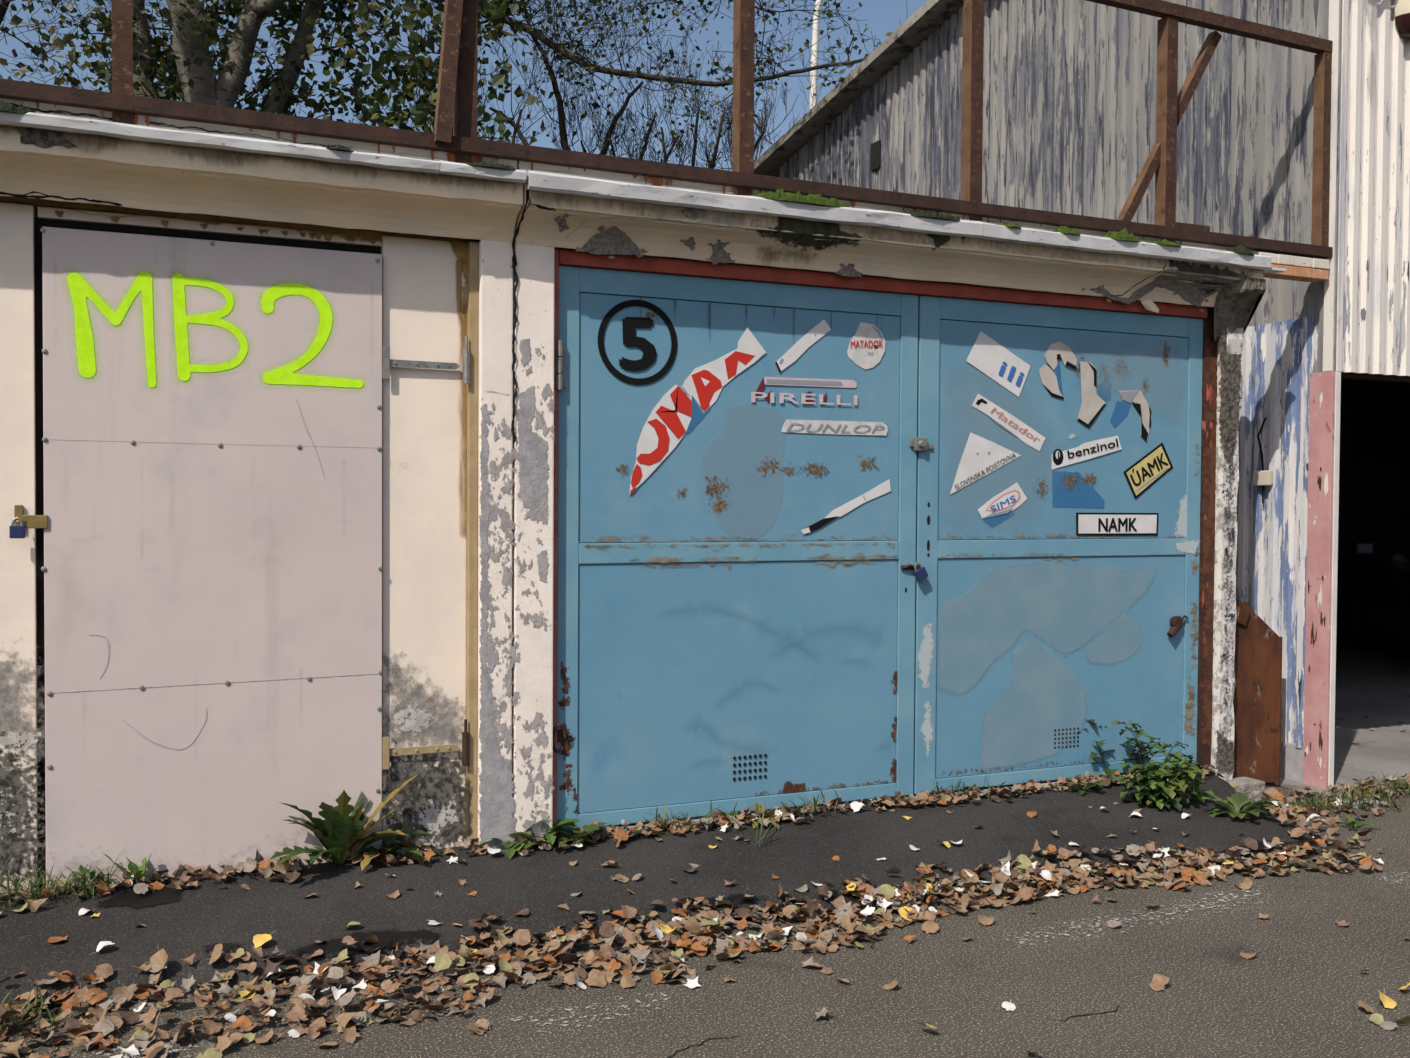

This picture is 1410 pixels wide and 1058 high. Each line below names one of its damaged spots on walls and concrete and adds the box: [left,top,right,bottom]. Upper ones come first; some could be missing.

spalling [554,213,570,232]
spalling [575,226,648,259]
crack [489,190,752,445]
spalling [1082,269,1243,313]
peeling [1387,257,1409,368]
peeling [477,339,555,849]
corrosion [586,545,679,563]
peeling [1202,248,1370,769]
leakage [0,654,46,892]
leakage [382,656,473,850]
corrosion [558,661,578,814]
corrosion [1233,598,1282,785]